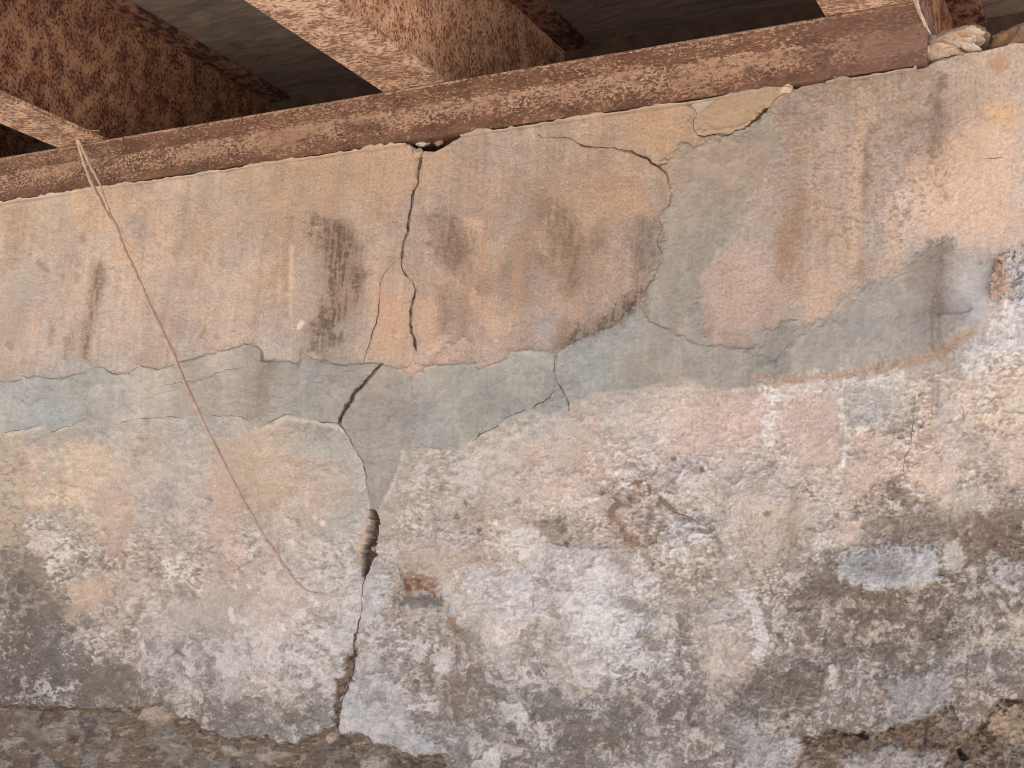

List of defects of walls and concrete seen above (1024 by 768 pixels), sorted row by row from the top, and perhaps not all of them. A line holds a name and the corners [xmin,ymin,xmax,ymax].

damp [239,199,379,434]
damp [410,191,493,339]
damp [524,183,671,355]
crack [537,134,774,359]
crack [416,353,570,451]
spalling [0,643,447,768]
crack [338,578,366,722]
spalling [726,665,1024,768]